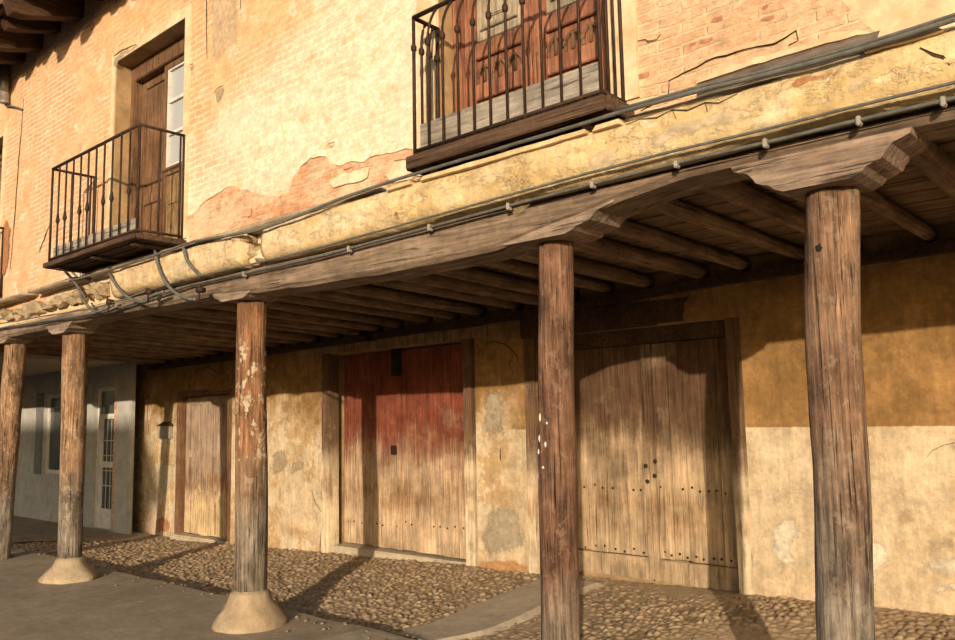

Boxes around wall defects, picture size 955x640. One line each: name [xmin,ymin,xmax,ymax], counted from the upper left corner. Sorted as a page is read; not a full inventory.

spalling [626,0,955,113]
spalling [187,140,422,241]